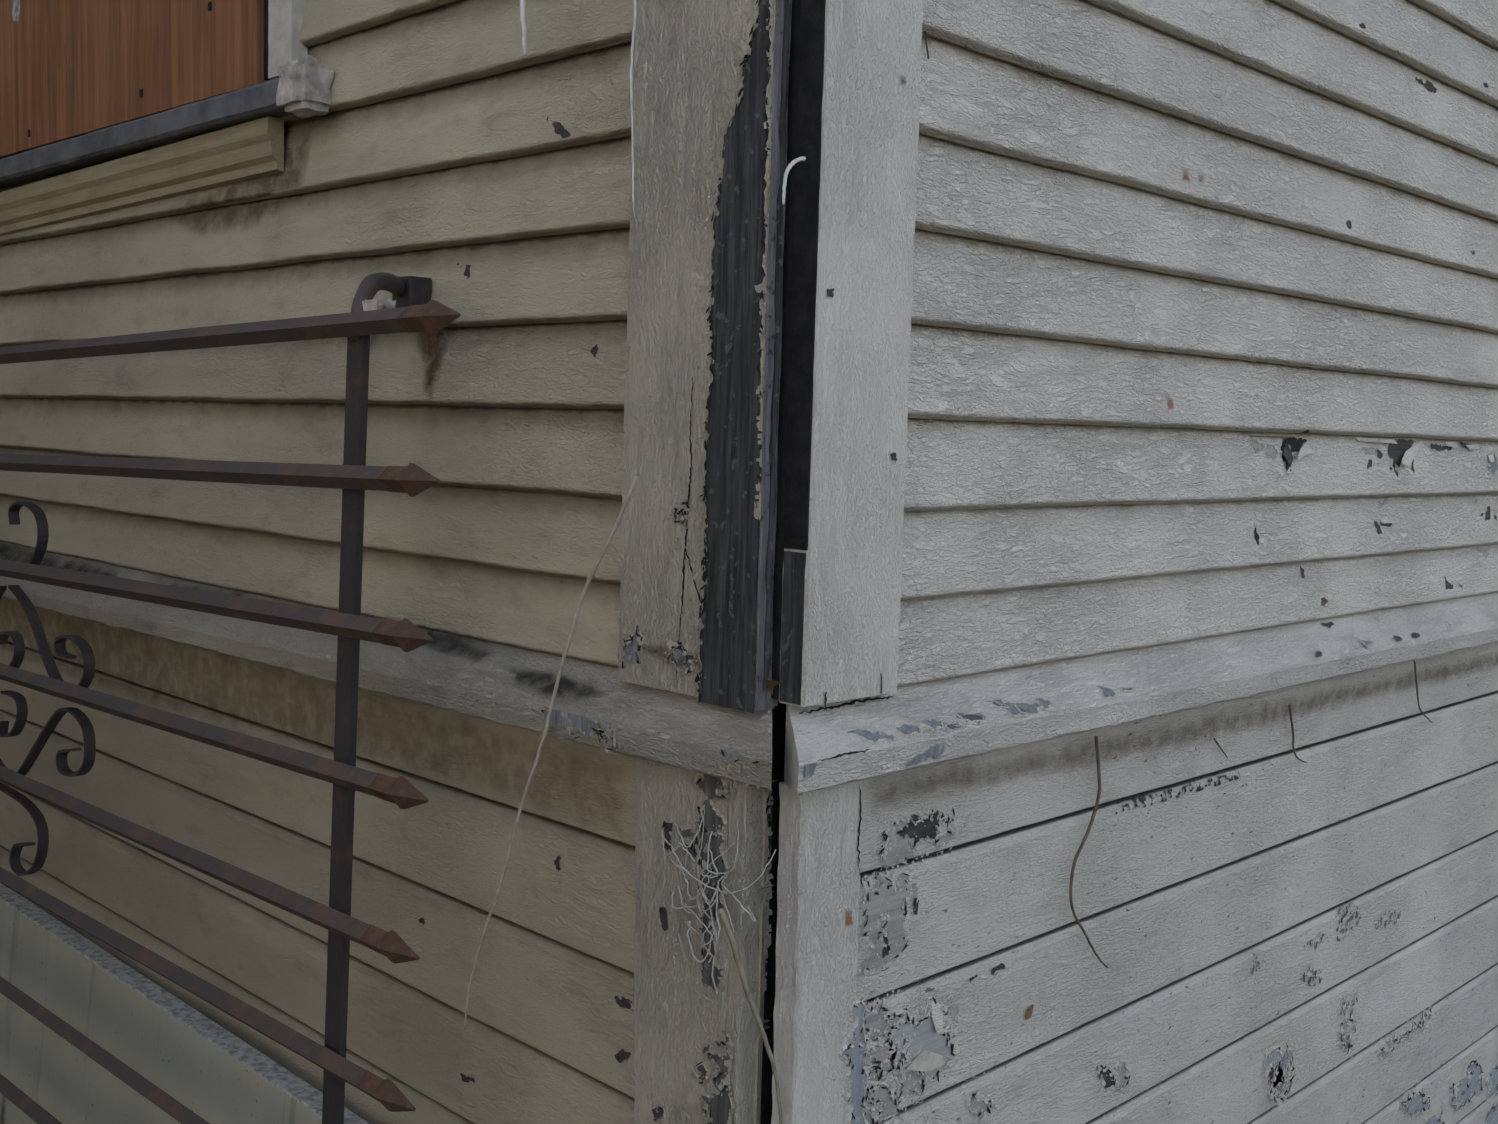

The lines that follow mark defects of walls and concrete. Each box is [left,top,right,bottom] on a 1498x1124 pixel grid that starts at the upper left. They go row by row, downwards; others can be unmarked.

peeling [617,0,792,713]
peeling [1367,434,1498,480]
peeling [1374,499,1394,534]
peeling [1473,496,1497,521]
peeling [1096,685,1136,700]
peeling [644,749,774,996]
peeling [832,697,1053,1124]
peeling [637,1086,664,1124]
peeling [685,1030,737,1124]
peeling [1089,1043,1138,1124]
peeling [1259,1034,1300,1124]
peeling [1395,1045,1498,1124]